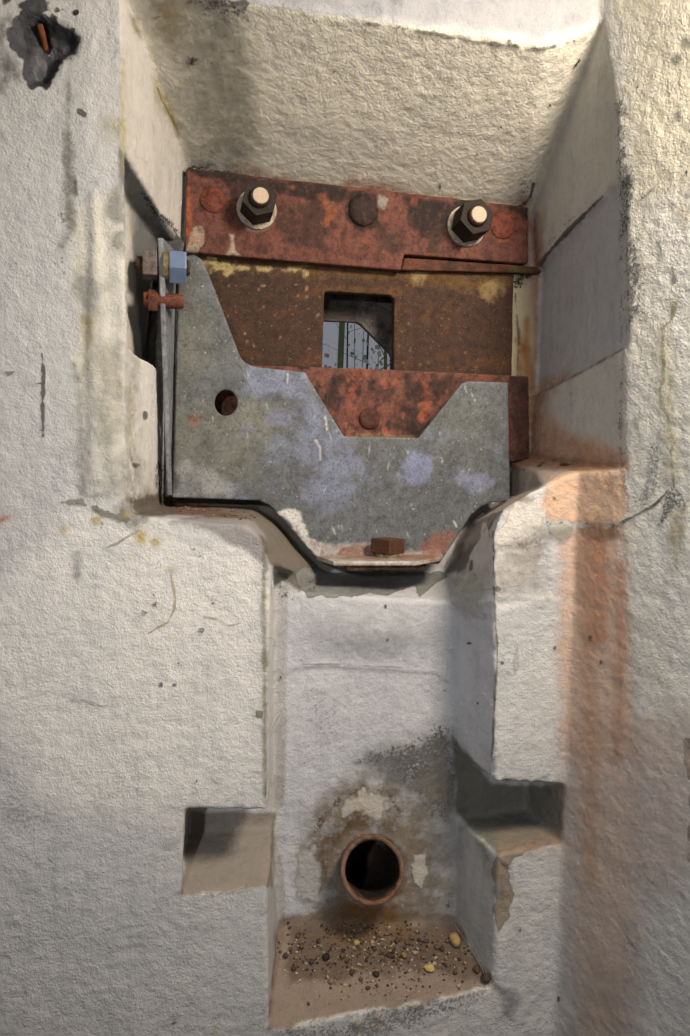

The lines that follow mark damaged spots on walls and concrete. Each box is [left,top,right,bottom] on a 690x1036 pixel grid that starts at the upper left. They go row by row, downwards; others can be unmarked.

spalling [0,0,81,100]
damp [160,0,260,176]
crack [546,241,688,562]
damp [295,723,457,918]
peeling [491,841,536,931]
corrosion [516,456,633,1027]
crack [682,794,690,862]